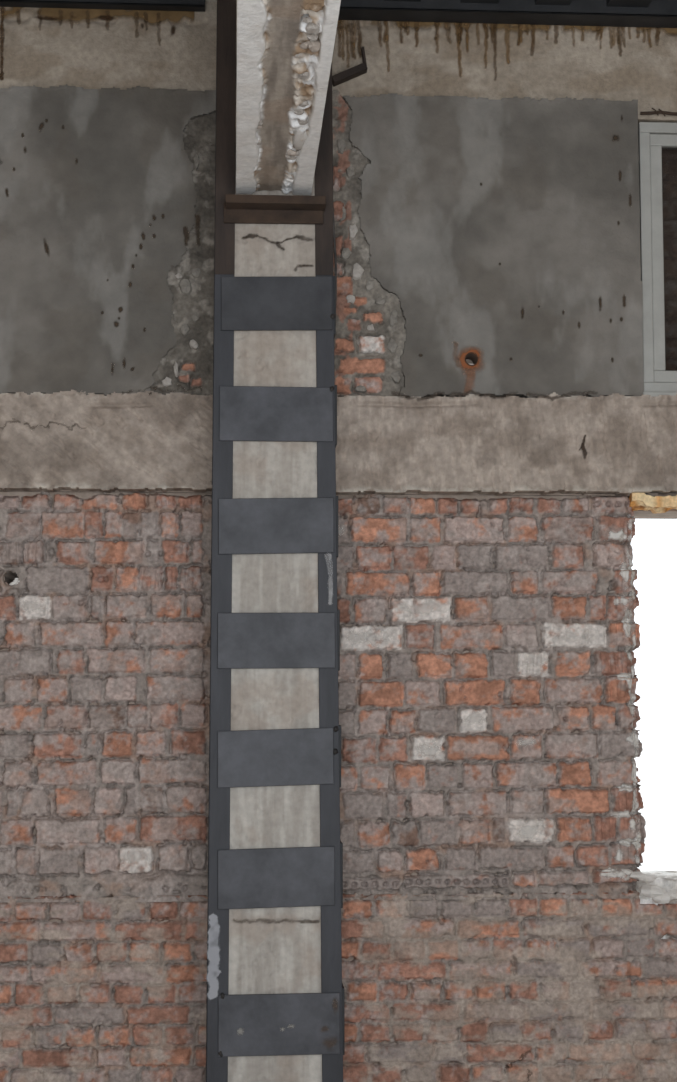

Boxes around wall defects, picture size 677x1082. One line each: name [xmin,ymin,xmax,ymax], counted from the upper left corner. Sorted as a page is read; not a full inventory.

crack [0,7,8,80]
spalling [255,0,325,194]
flaking render [150,112,216,395]
crack [242,234,312,270]
flaking render [332,89,406,397]